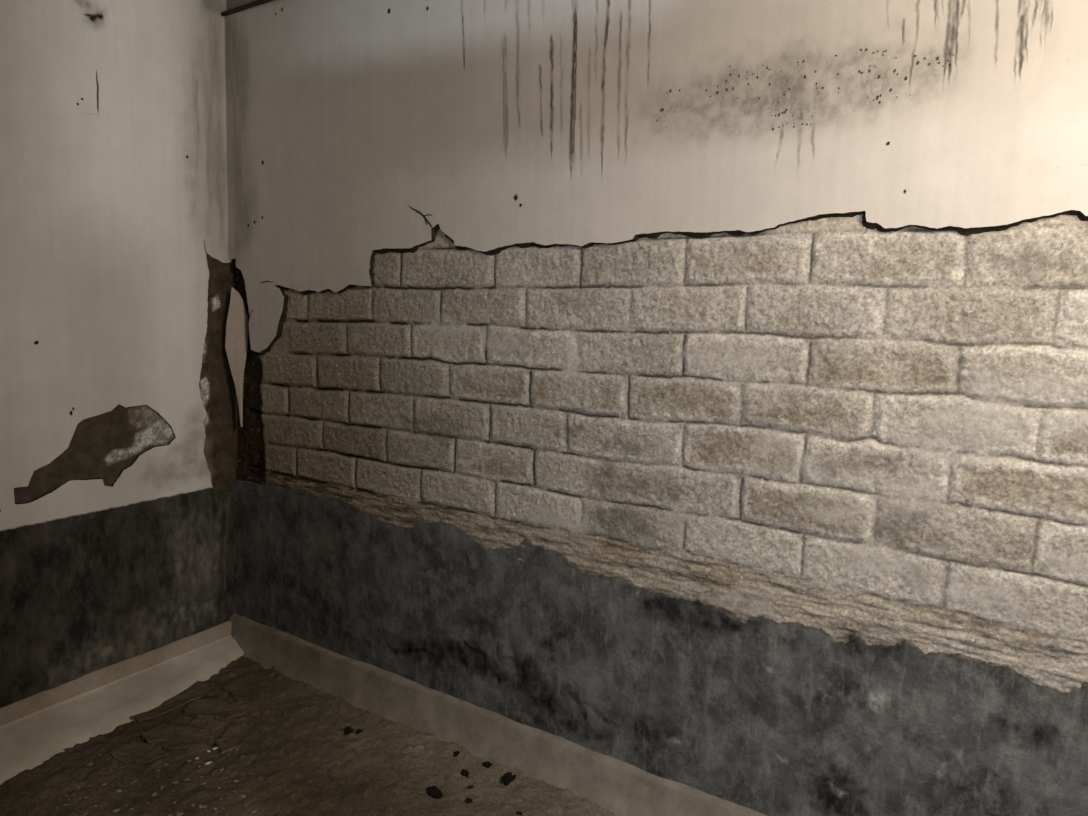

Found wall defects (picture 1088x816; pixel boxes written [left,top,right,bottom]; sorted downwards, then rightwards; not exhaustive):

spalling [14,404,176,504]
spalling [199,210,1088,693]